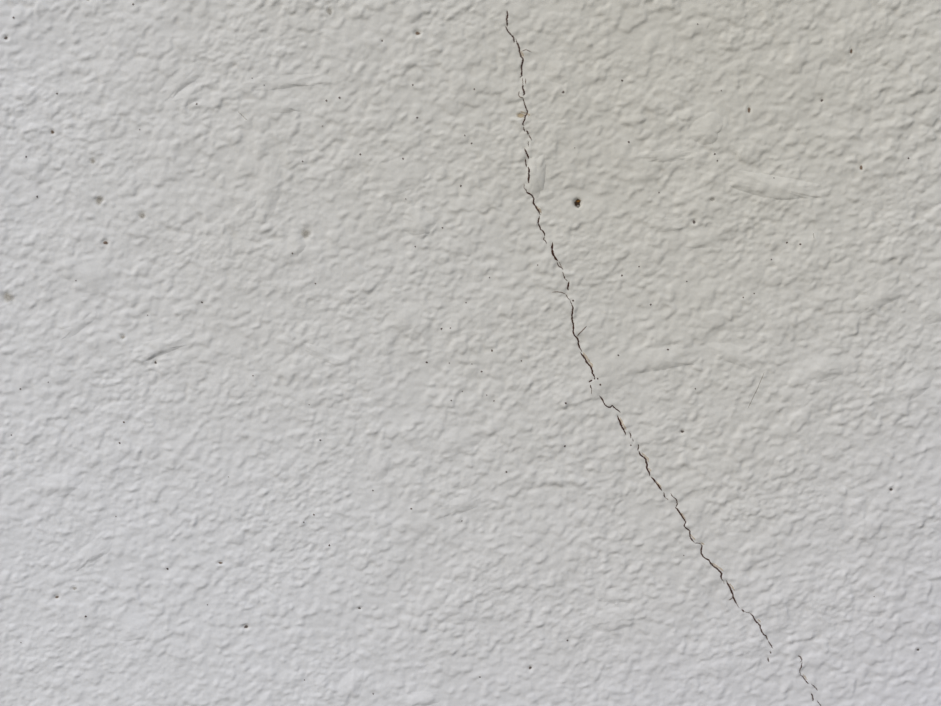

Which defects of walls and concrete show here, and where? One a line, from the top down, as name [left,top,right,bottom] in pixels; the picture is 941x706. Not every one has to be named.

crack [505,11,772,662]